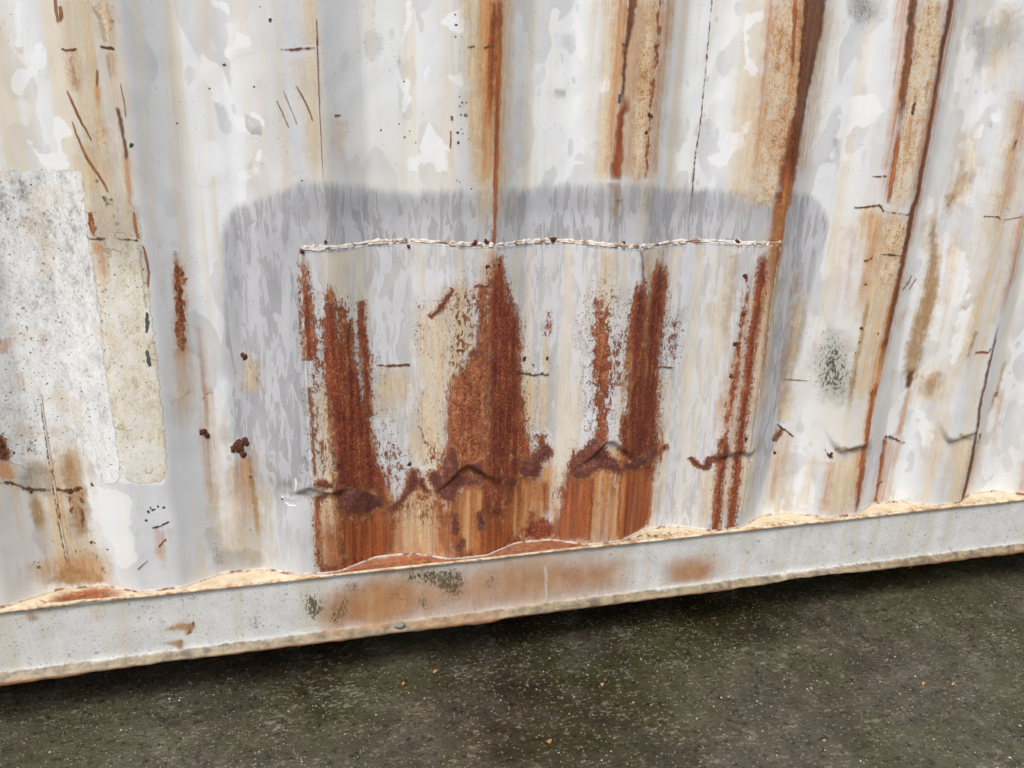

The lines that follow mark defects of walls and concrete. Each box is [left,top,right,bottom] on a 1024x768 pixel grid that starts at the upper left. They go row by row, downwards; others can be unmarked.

peeling [0,108,172,574]
rust [173,250,188,351]
rust [296,0,686,574]
rust [687,0,826,530]
rust [851,0,955,514]